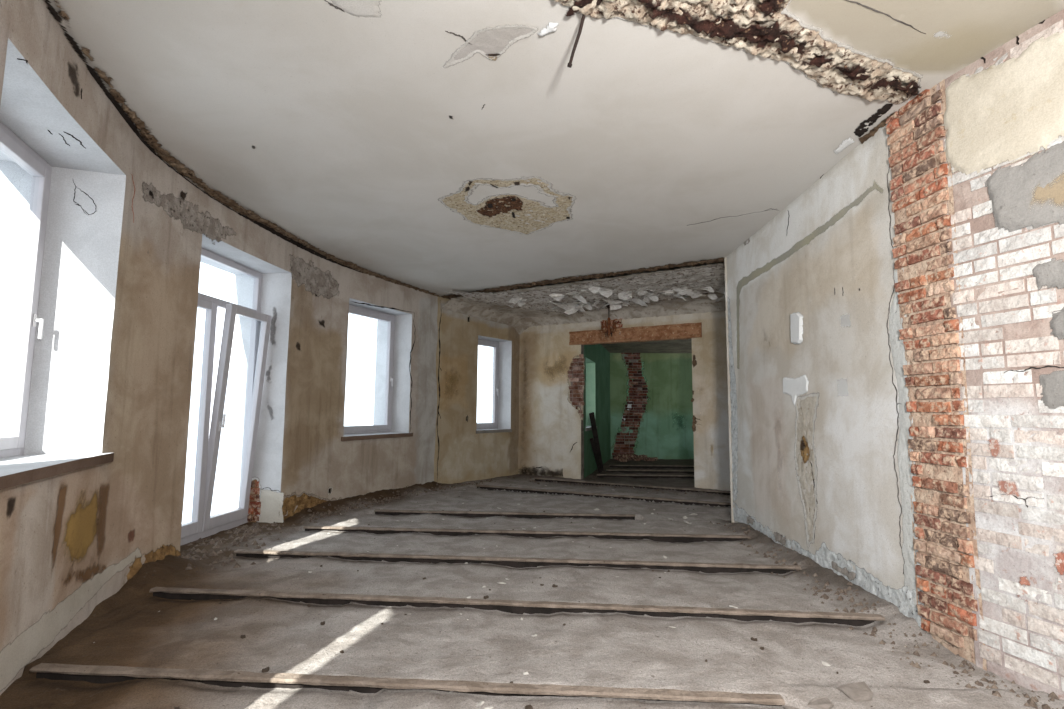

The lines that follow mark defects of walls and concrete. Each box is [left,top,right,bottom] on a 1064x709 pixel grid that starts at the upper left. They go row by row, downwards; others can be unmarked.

peeling [443,22,559,68]
crack [846,0,926,34]
flaking render [142,182,236,245]
crack [687,208,789,236]
flaking render [290,254,339,299]
flaking render [438,84,978,648]
crack [887,135,905,574]
water stain [52,484,109,584]